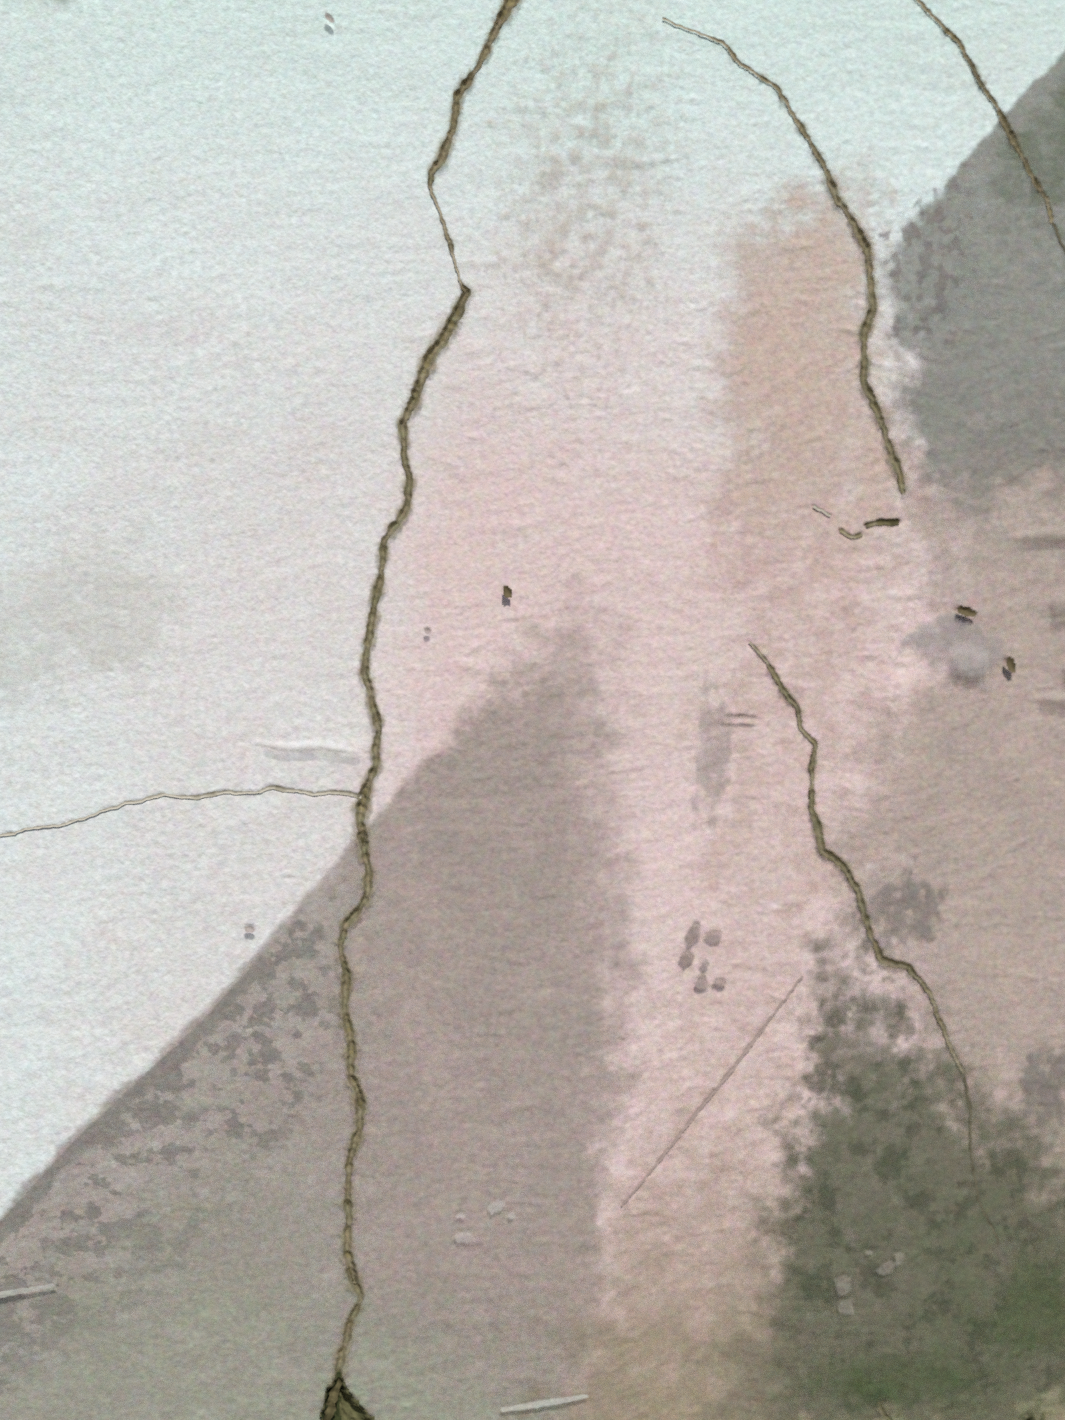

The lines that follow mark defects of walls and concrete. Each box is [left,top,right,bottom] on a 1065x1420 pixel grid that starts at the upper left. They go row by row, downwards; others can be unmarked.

crack [662,17,907,538]
water stain [890,53,1065,489]
crack [916,0,1065,250]
crack [0,0,521,1420]
water stain [0,686,613,1420]
crack [749,641,1000,1244]
spalling [320,1370,375,1420]